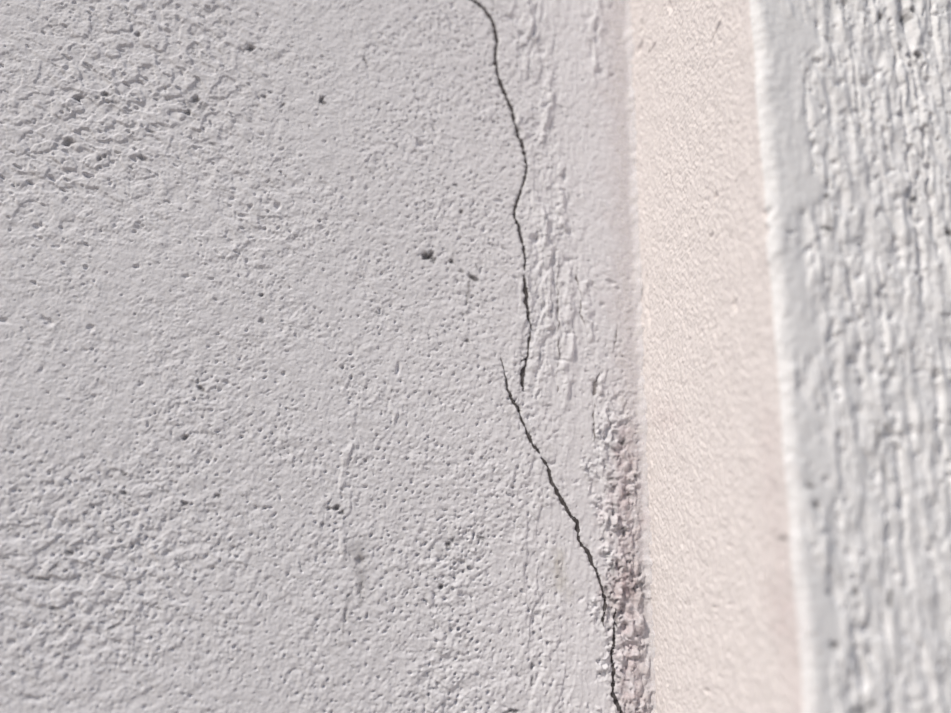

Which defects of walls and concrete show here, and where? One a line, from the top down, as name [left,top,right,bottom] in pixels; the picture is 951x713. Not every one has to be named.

crack [470,0,623,713]